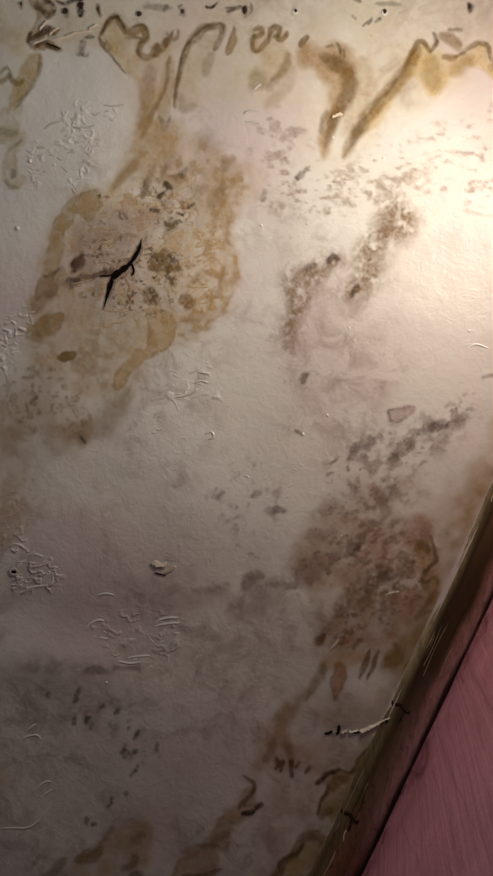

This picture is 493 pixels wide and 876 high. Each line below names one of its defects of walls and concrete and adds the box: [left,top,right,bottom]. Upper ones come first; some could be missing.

water stain [27,0,84,50]
water stain [96,6,170,60]
water stain [214,28,236,54]
water stain [251,25,288,52]
water stain [394,39,439,82]
water stain [134,181,172,212]
water stain [40,194,129,297]
crack [77,233,143,310]
water stain [118,204,194,311]
water stain [58,345,84,362]
peeling [324,700,410,735]
water stain [234,778,263,818]